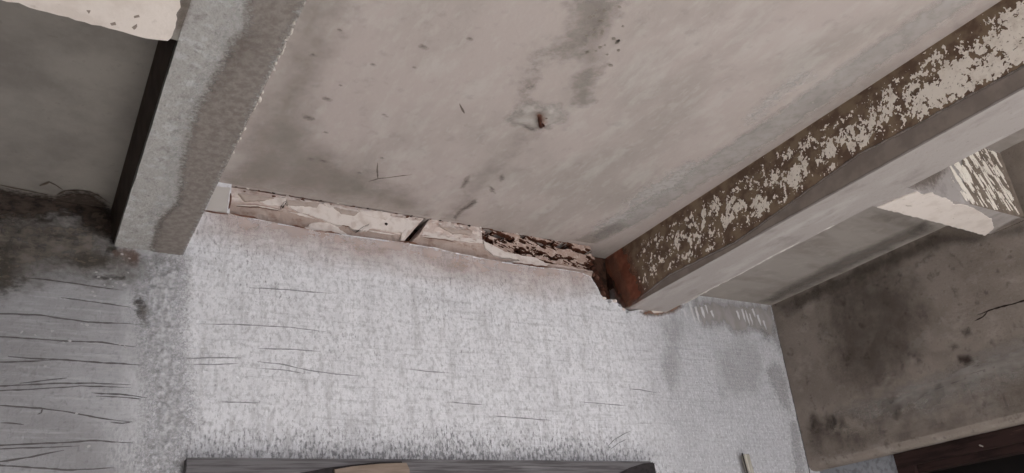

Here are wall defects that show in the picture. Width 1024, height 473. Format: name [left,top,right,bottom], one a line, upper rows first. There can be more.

leakage [0,39,176,289]
corrosion [605,247,642,307]
peeling [227,0,1024,316]
leakage [682,225,923,473]